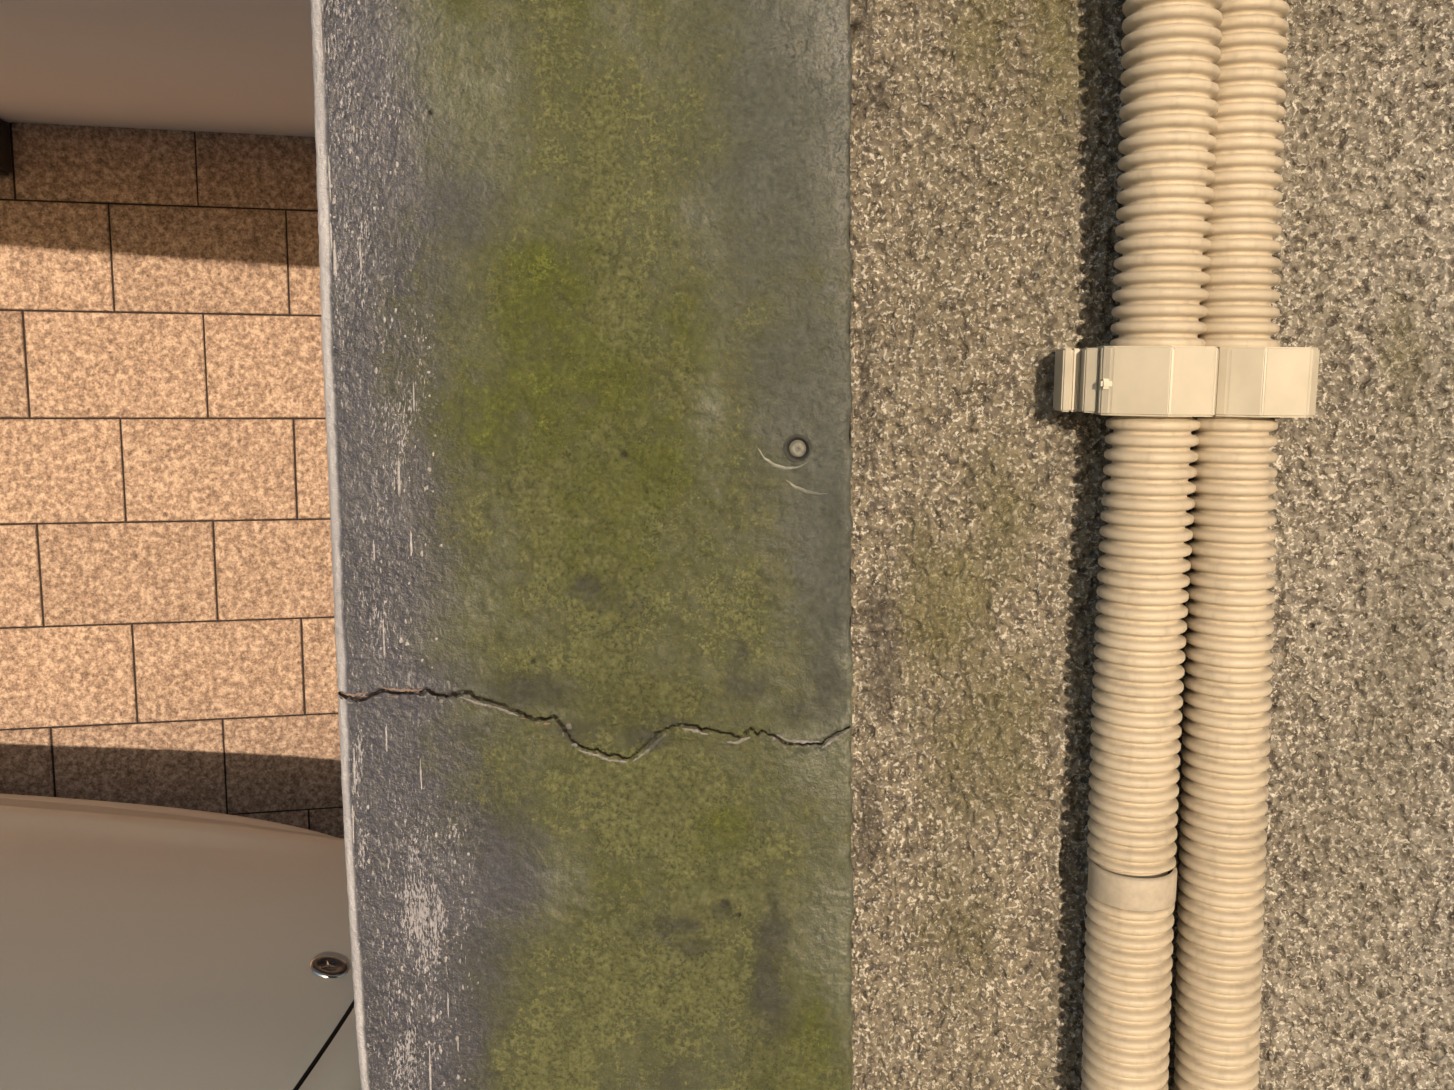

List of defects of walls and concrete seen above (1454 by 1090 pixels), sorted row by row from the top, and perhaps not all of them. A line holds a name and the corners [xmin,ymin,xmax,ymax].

crack [338,687,850,763]